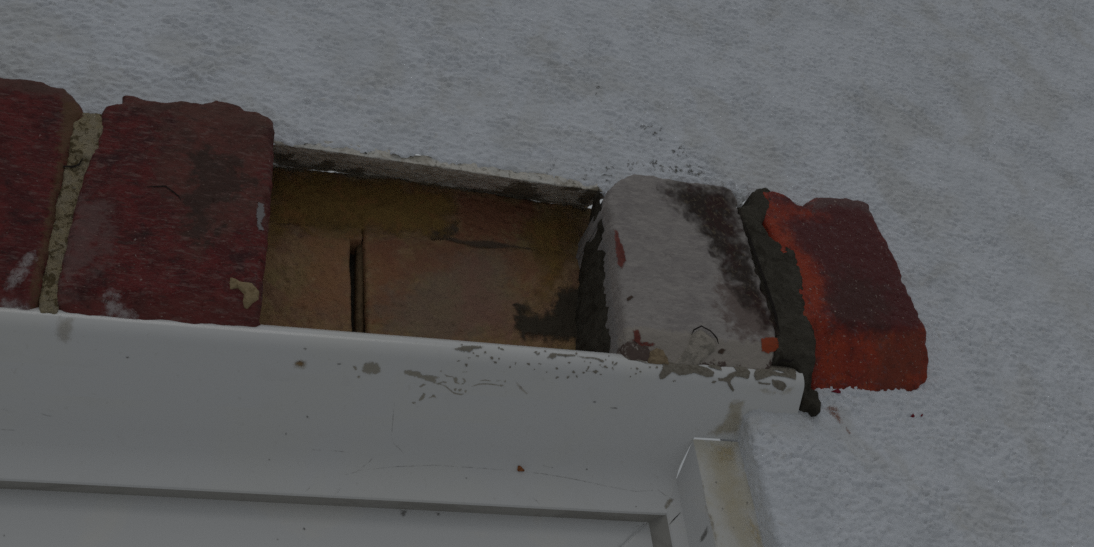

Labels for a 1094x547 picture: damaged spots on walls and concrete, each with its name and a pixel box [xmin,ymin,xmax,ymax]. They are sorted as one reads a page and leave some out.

leakage [270,153,796,404]